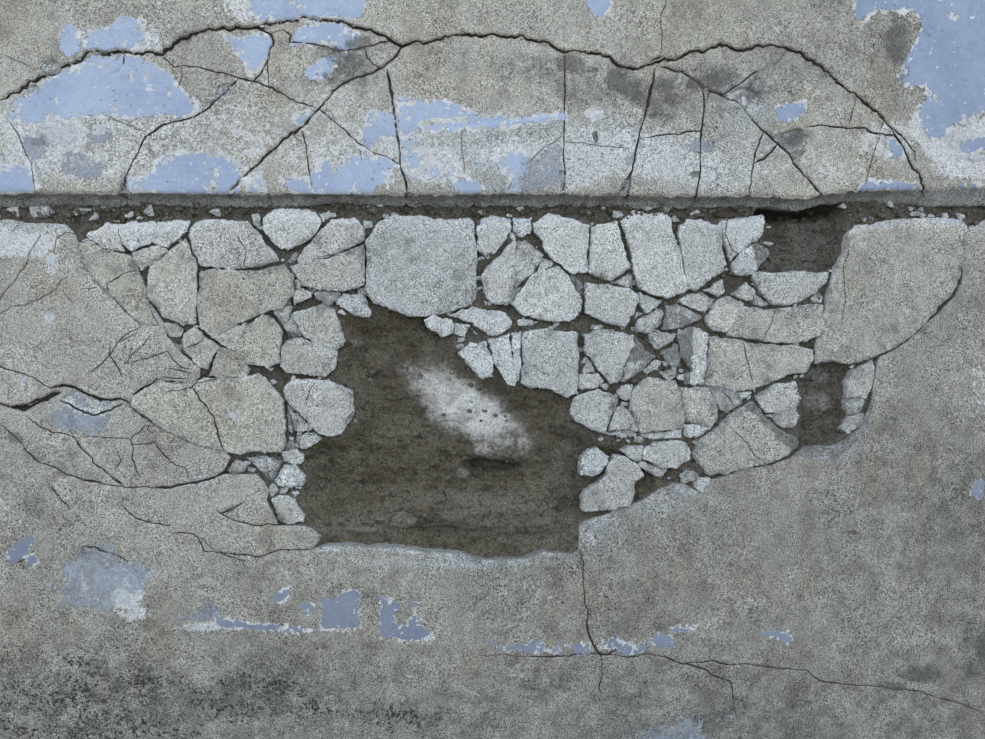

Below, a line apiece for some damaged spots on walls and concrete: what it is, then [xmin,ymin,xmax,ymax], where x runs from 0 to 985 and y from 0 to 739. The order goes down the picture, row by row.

peeling [0,15,202,194]
peeling [222,0,370,83]
peeling [120,94,569,195]
crack [0,0,925,254]
peeling [852,0,985,153]
crack [0,232,167,313]
spalling [754,201,851,276]
crack [0,306,310,567]
crack [287,383,317,455]
spalling [296,307,699,566]
spalling [795,361,854,449]
crack [480,550,981,719]